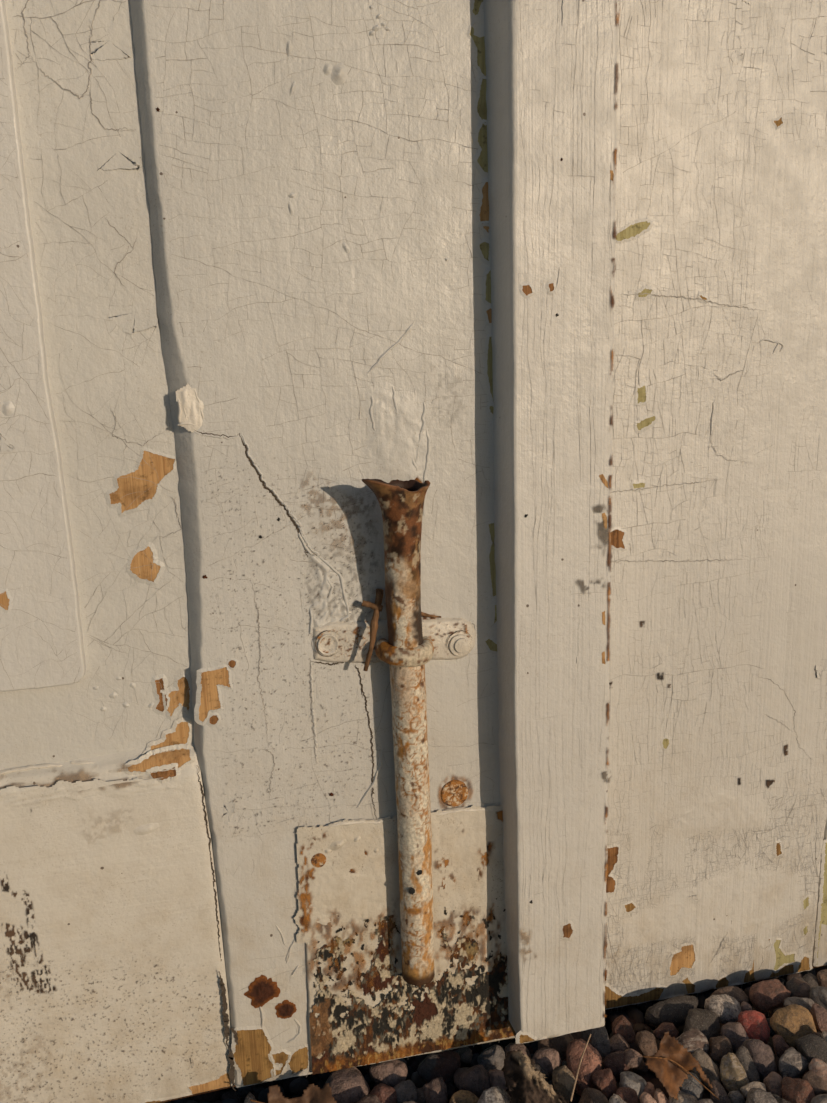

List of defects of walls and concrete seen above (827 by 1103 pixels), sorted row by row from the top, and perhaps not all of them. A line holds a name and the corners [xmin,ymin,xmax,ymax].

peeling [466,0,494,418]
peeling [105,447,177,517]
crack [0,0,490,1091]
peeling [123,658,239,784]
peeling [606,844,621,895]
peeling [622,900,638,914]
rust [244,834,514,1075]
peeling [604,942,697,1009]
peeling [141,1025,311,1103]